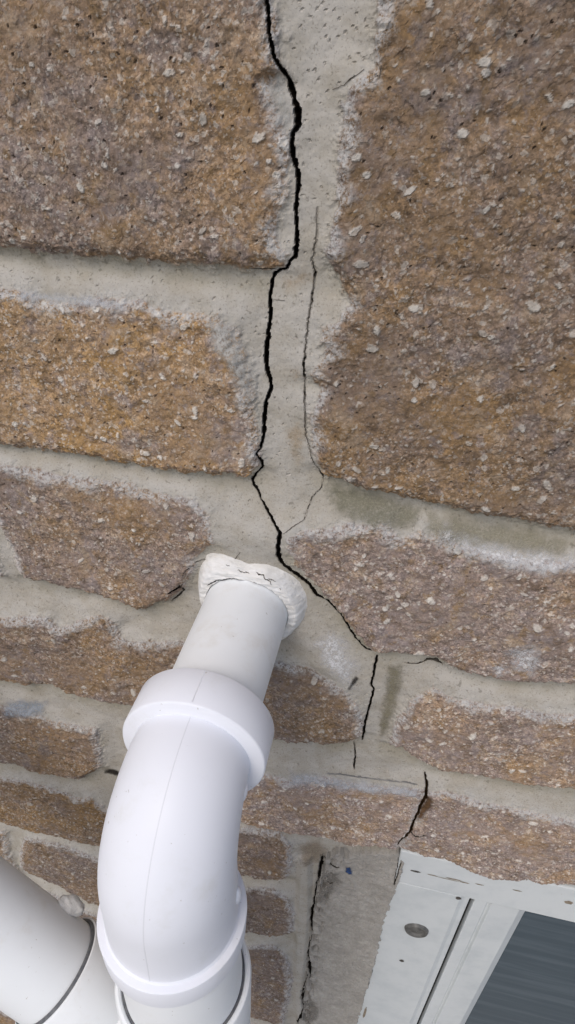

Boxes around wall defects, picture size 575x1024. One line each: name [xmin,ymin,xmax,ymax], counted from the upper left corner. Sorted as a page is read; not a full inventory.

crack [167,0,428,885]
crack [408,656,442,664]
crack [297,854,339,1023]